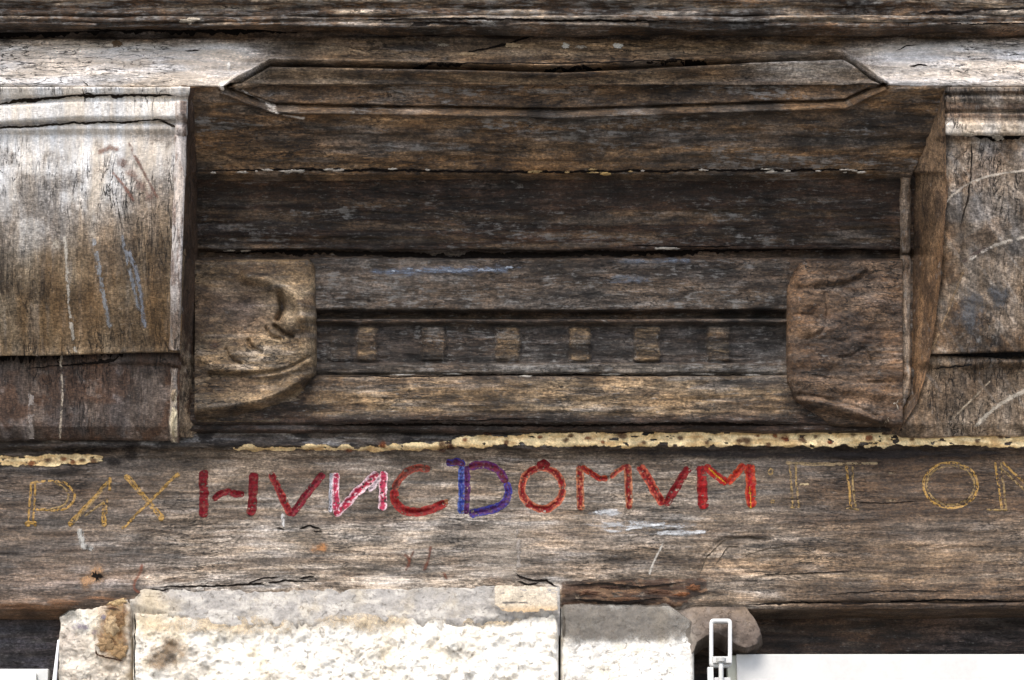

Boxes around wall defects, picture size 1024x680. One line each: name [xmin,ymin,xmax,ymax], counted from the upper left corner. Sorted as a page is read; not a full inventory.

crack [353,17,707,73]
crack [0,80,176,129]
crack [150,576,317,591]